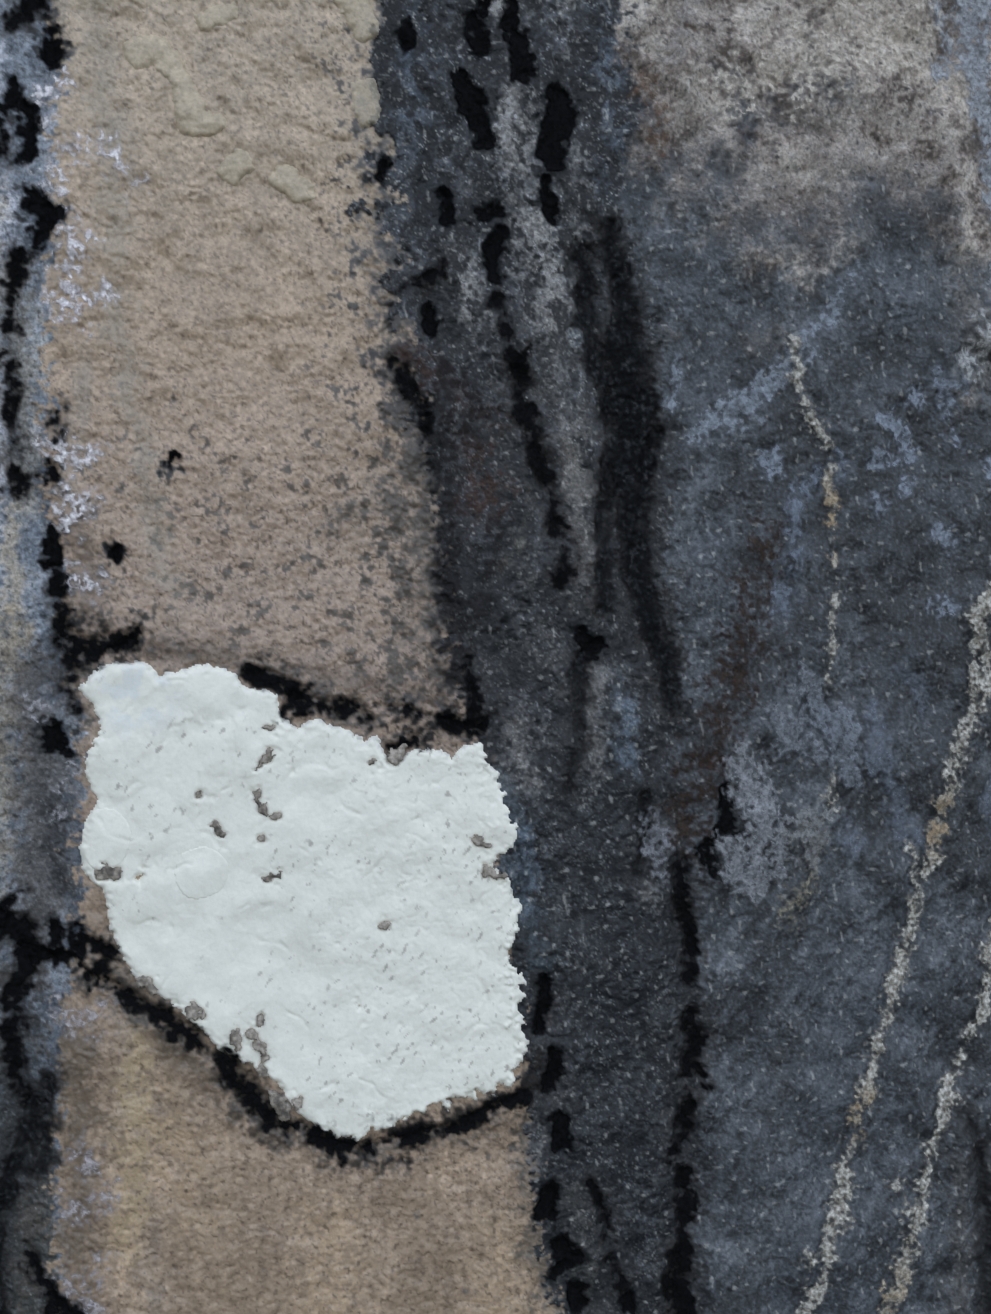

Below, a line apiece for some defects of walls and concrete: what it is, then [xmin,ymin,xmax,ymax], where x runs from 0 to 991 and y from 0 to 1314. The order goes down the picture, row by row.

crack [2,0,50,31]
crack [0,112,10,156]
crack [398,257,448,292]
crack [0,246,67,499]
crack [388,356,437,437]
crack [486,214,685,717]
crack [44,564,141,715]
crack [241,654,490,757]
crack [563,651,595,794]
crack [631,787,714,1314]
crack [586,1178,631,1295]